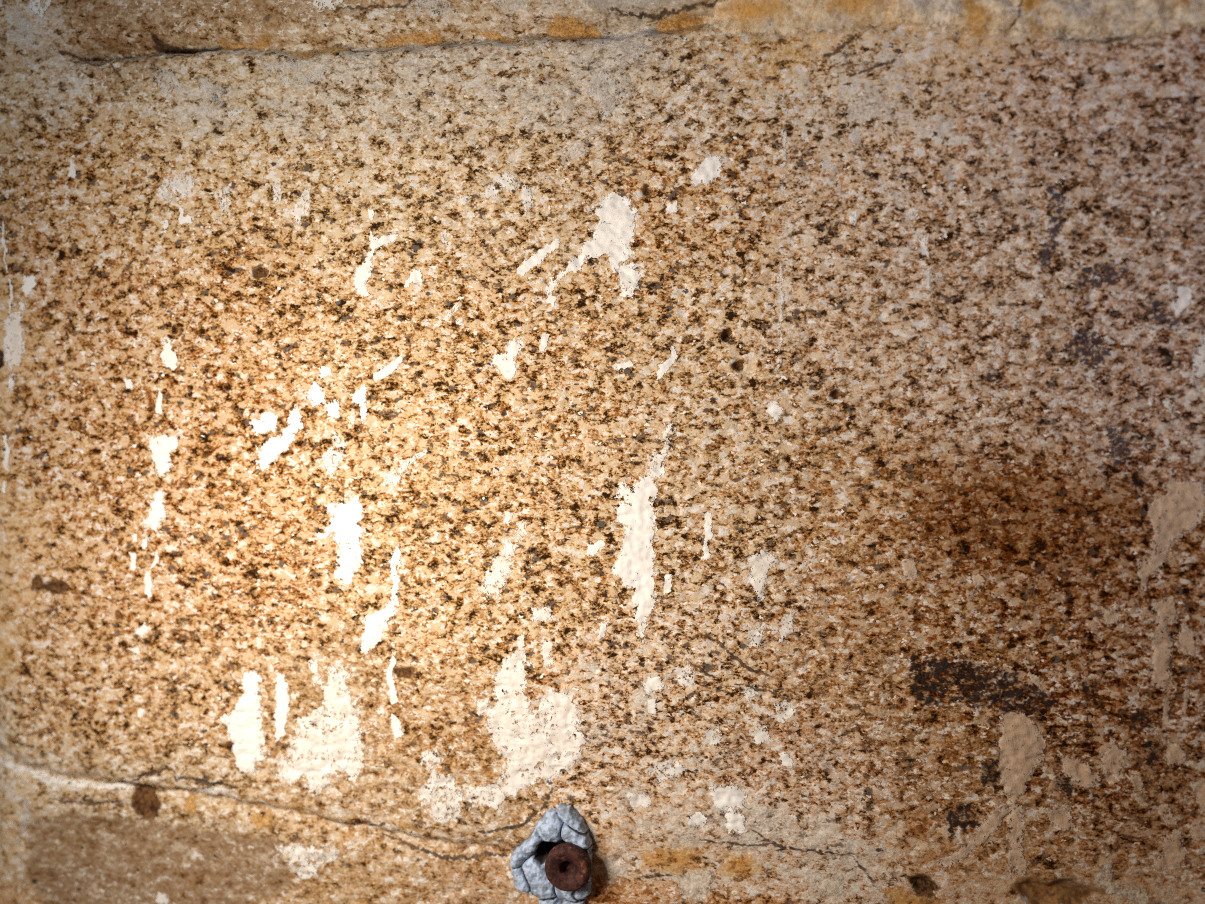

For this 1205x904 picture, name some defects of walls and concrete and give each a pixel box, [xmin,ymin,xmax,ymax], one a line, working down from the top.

crack [324,787,553,861]
crack [699,829,875,887]